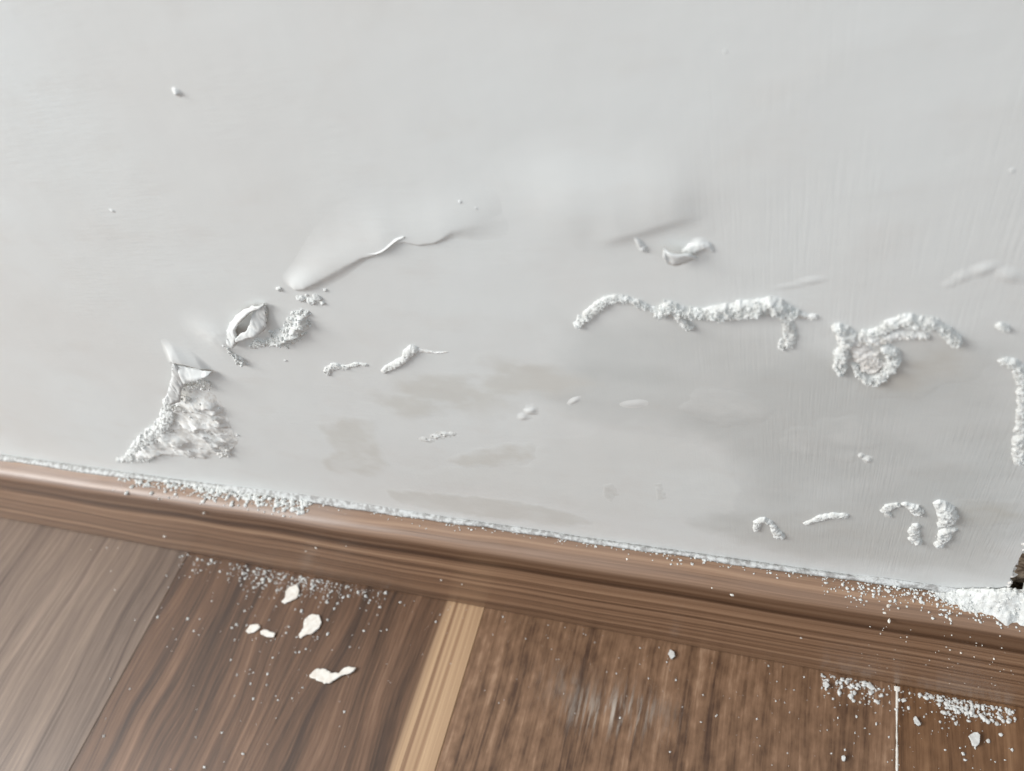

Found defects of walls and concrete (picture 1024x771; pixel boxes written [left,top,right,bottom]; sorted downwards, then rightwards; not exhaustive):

flaking render [116,288,327,463]
damp [314,289,1024,582]
flaking render [1006,543,1024,589]